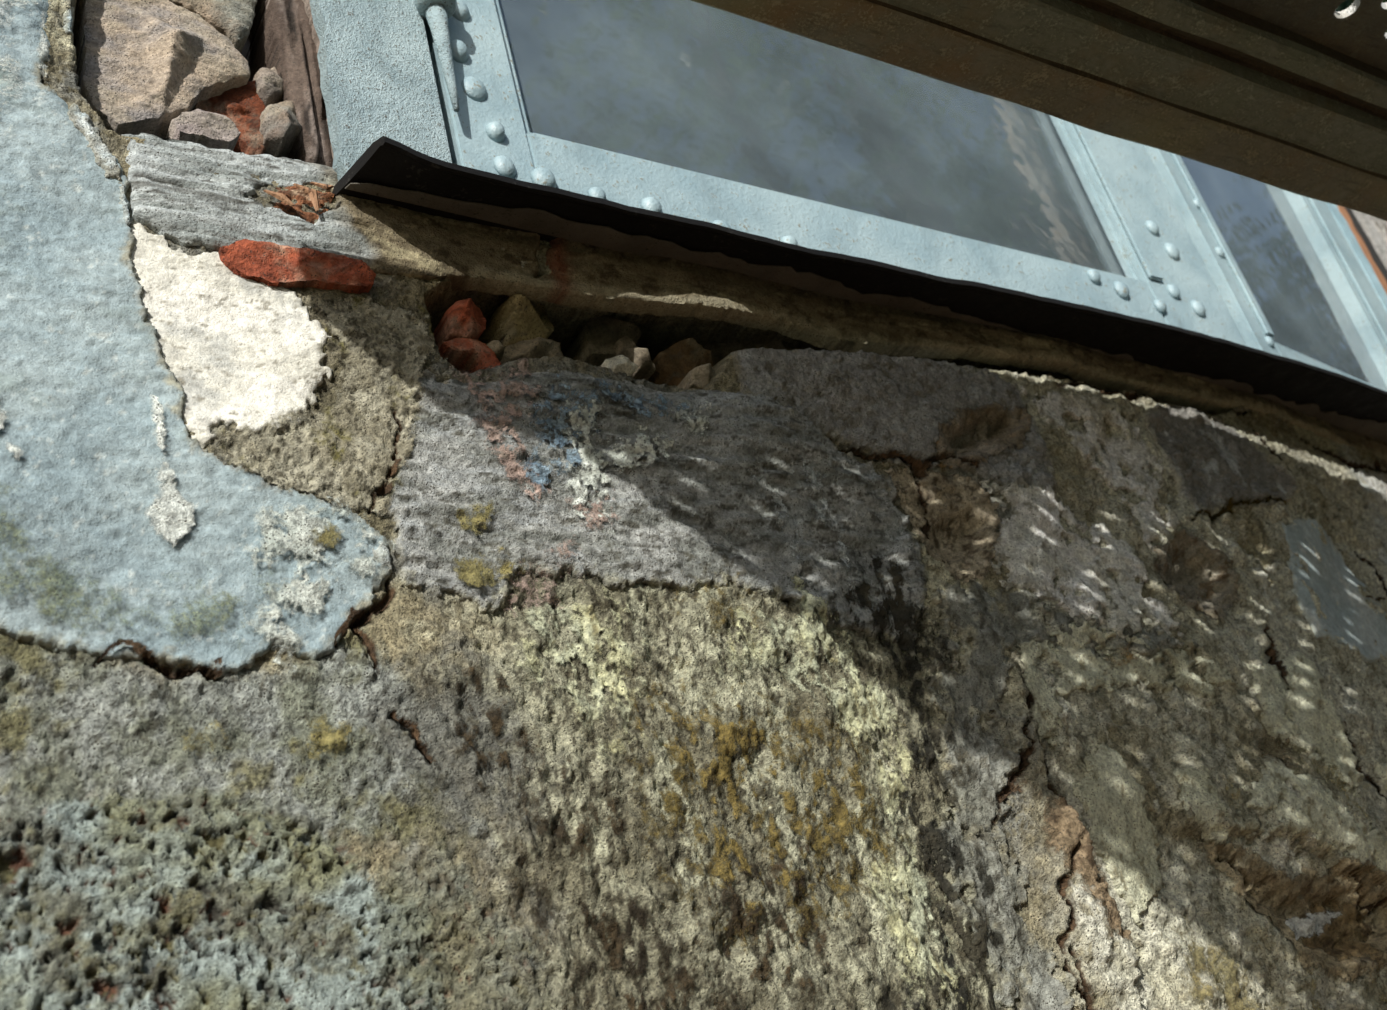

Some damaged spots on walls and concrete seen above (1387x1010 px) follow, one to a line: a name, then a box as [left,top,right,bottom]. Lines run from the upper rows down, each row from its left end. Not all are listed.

peeling [0,0,446,679]
crack [830,438,979,564]
crack [1354,552,1387,602]
crack [93,638,223,681]
crack [1263,624,1290,690]
crack [991,677,1058,825]
crack [1057,829,1097,1010]